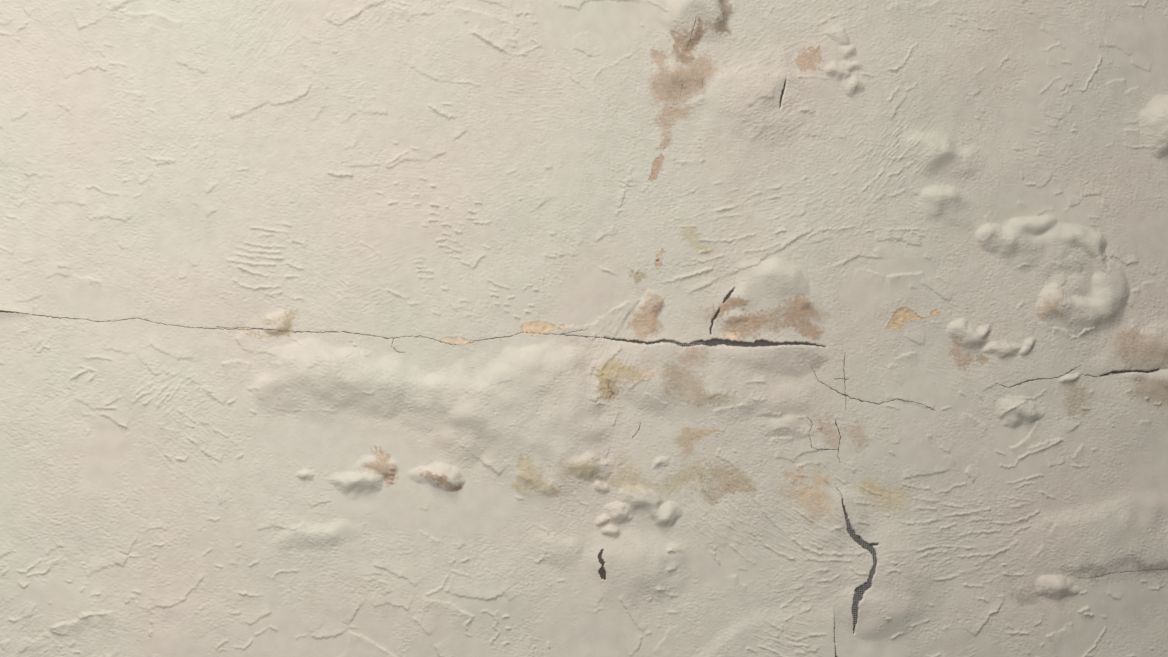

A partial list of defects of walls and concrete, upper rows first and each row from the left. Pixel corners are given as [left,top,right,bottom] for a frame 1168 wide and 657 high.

peeling [0,273,34,314]
crack [997,365,1159,388]
crack [32,288,933,657]